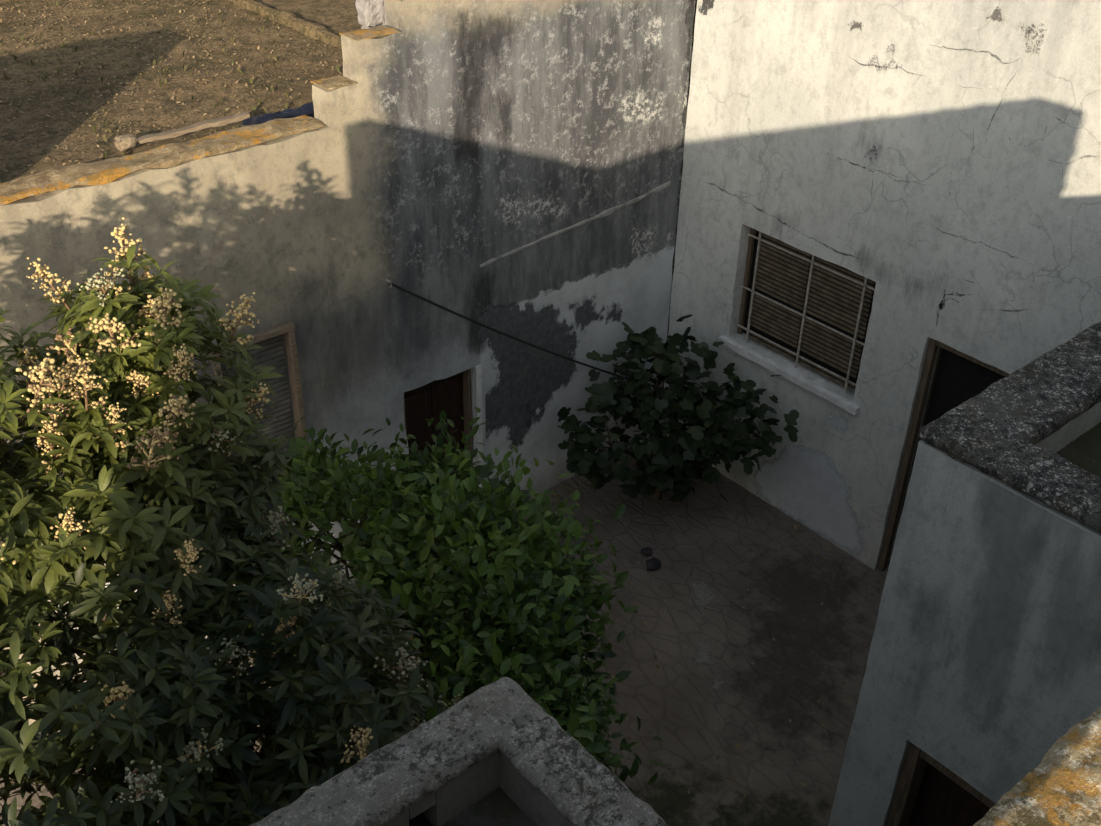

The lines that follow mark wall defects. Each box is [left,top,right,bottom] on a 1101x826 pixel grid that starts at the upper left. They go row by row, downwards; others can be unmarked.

damp [455,14,510,160]
crack [943,46,1017,149]
peeling [476,295,622,449]
crack [937,282,975,317]